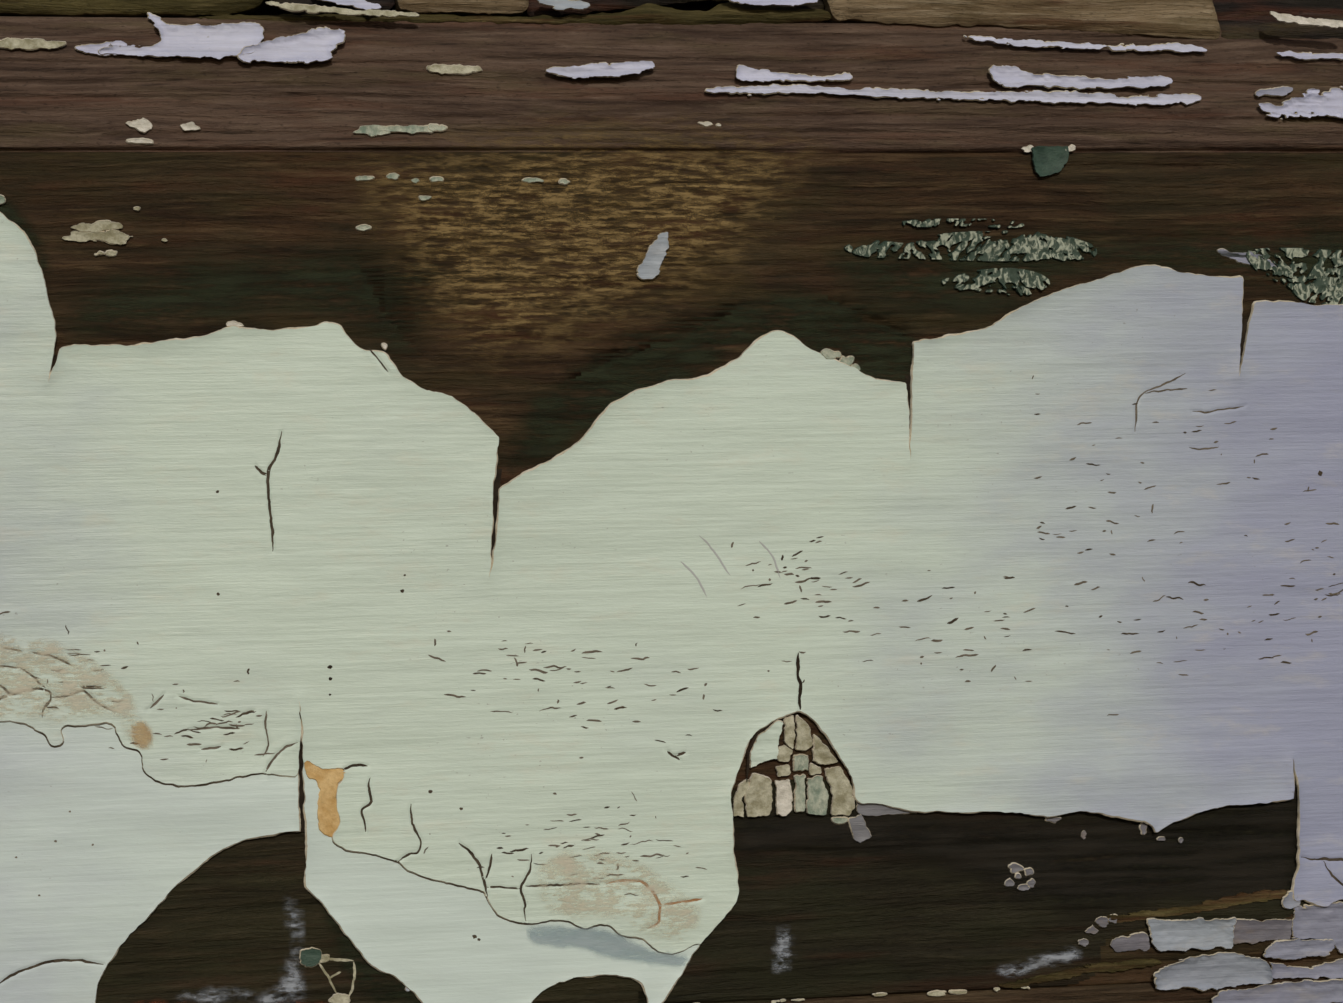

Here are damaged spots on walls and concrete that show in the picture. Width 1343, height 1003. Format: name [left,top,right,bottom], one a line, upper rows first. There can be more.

peeling [0,0,419,64]
peeling [705,64,1201,106]
peeling [1255,86,1343,120]
leakage [841,234,1343,310]
crack [255,431,282,551]
crack [491,469,502,557]
crack [731,373,1343,682]
crack [768,652,805,710]
crack [0,626,722,955]
peeling [96,761,421,1003]
peeling [663,715,1343,1003]
peeling [532,975,647,1003]